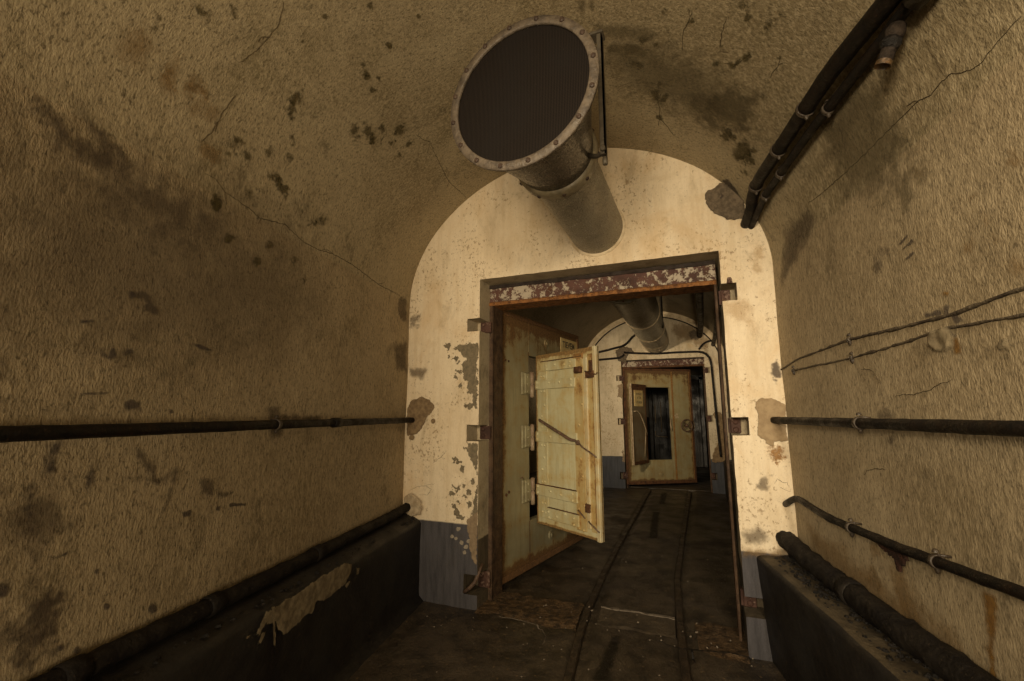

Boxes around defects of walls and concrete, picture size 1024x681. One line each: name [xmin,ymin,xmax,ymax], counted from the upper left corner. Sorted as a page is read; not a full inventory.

crack [809,16,1021,202]
damp [720,128,757,175]
crack [205,173,402,297]
peeling [444,342,479,410]
rust [767,446,787,465]
peeling [449,443,478,564]
peeling [247,563,360,646]